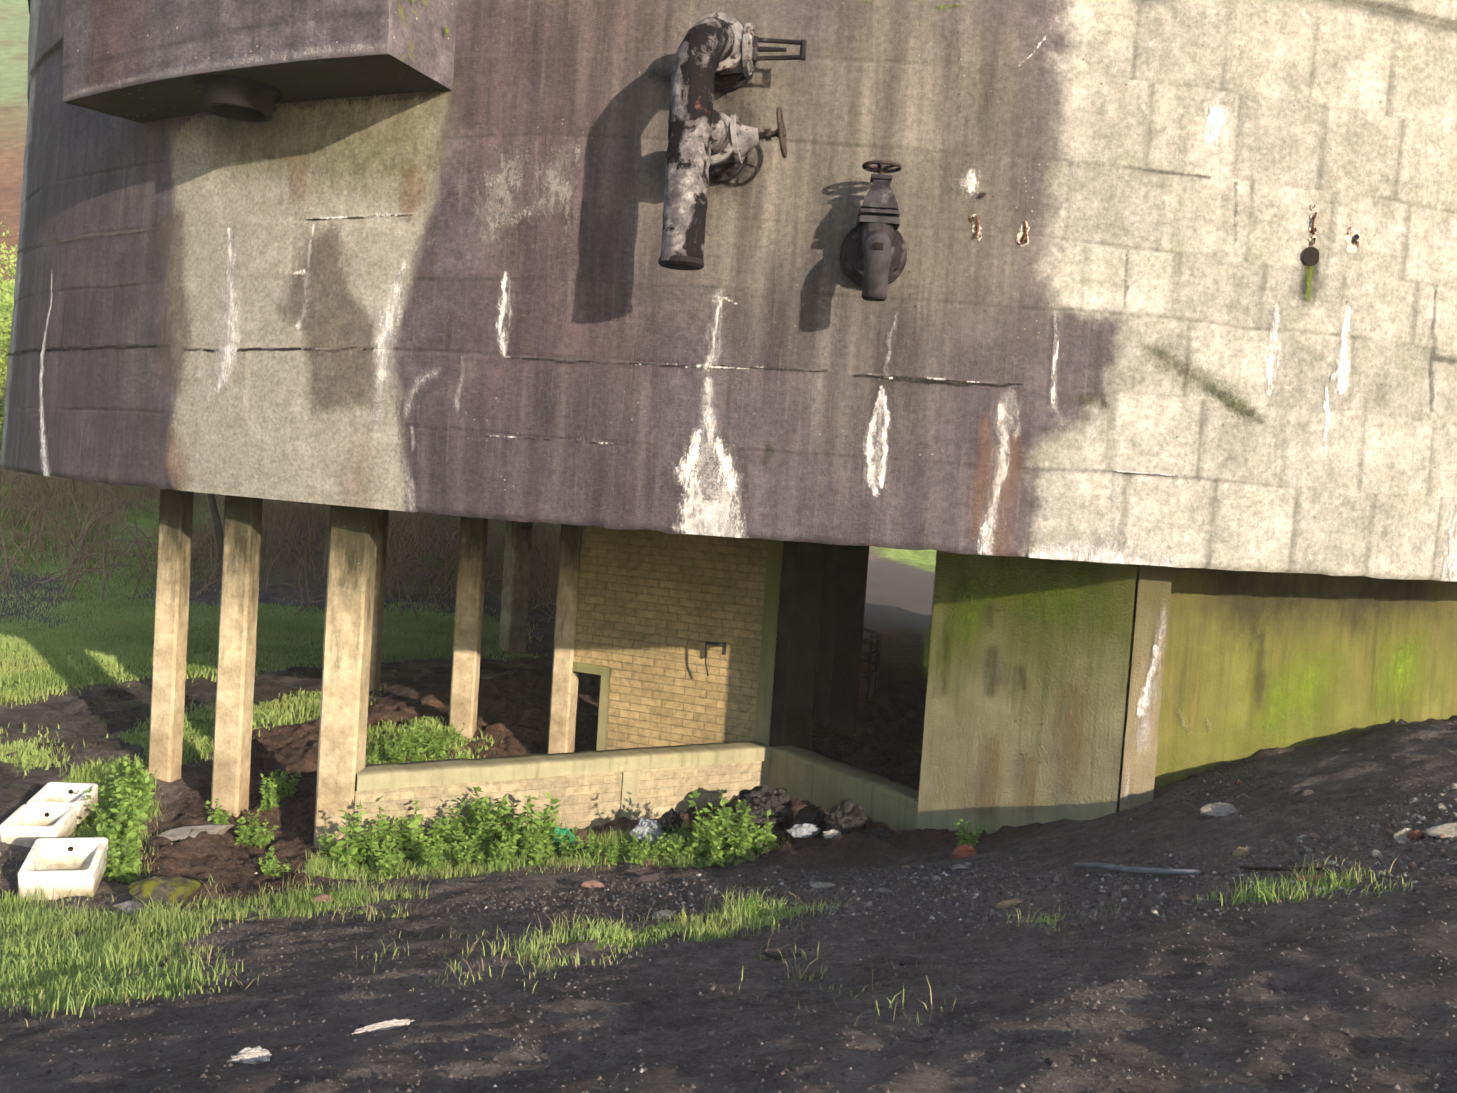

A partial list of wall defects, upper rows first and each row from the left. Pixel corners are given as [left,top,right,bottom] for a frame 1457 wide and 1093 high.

crack [305,213,413,221]
spalling [961,169,986,241]
crack [5,344,401,357]
damp [160,91,449,511]
damp [675,291,746,538]
damp [865,386,890,495]
damp [978,399,1018,555]
damp [1137,612,1165,747]